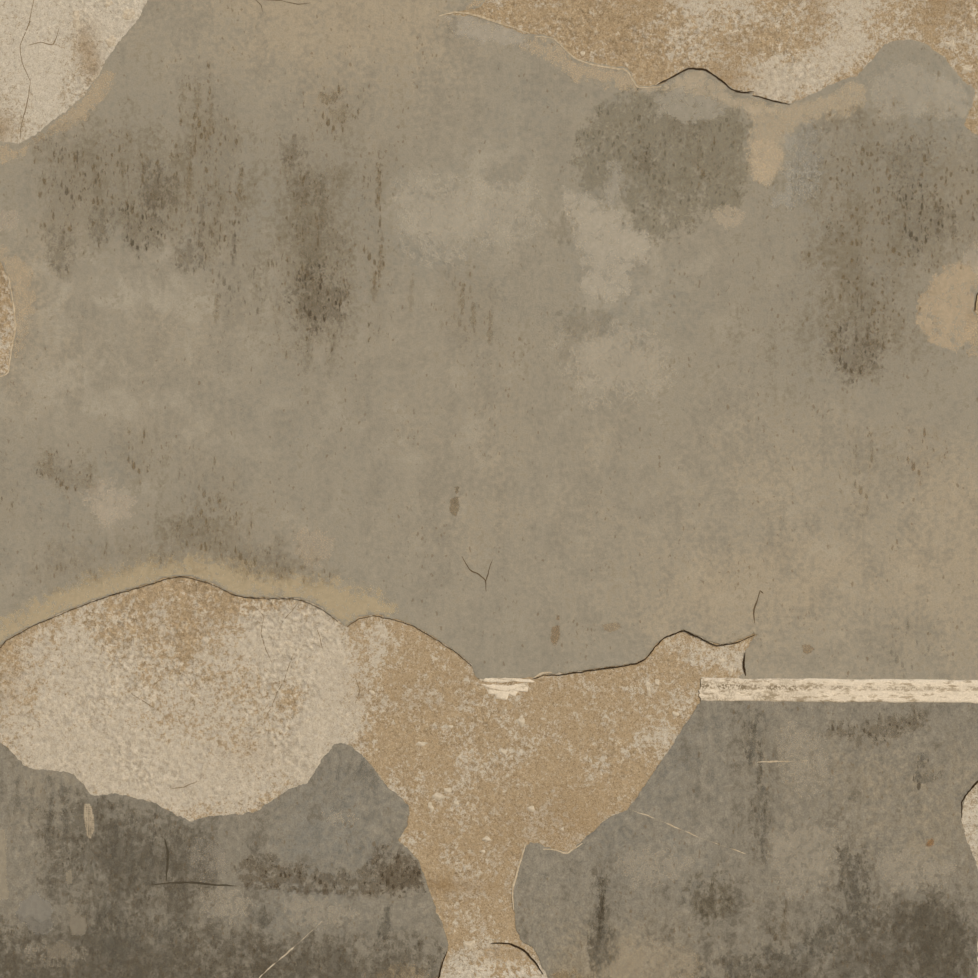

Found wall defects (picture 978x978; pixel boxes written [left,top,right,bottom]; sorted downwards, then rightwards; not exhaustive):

flaking render [0,0,147,144]
flaking render [439,0,978,135]
leakage [896,183,949,251]
flaking render [0,262,16,377]
leakage [289,216,349,352]
crack [462,557,493,589]
leakage [246,852,421,895]
flaking render [0,576,757,978]
flaking render [961,780,978,868]